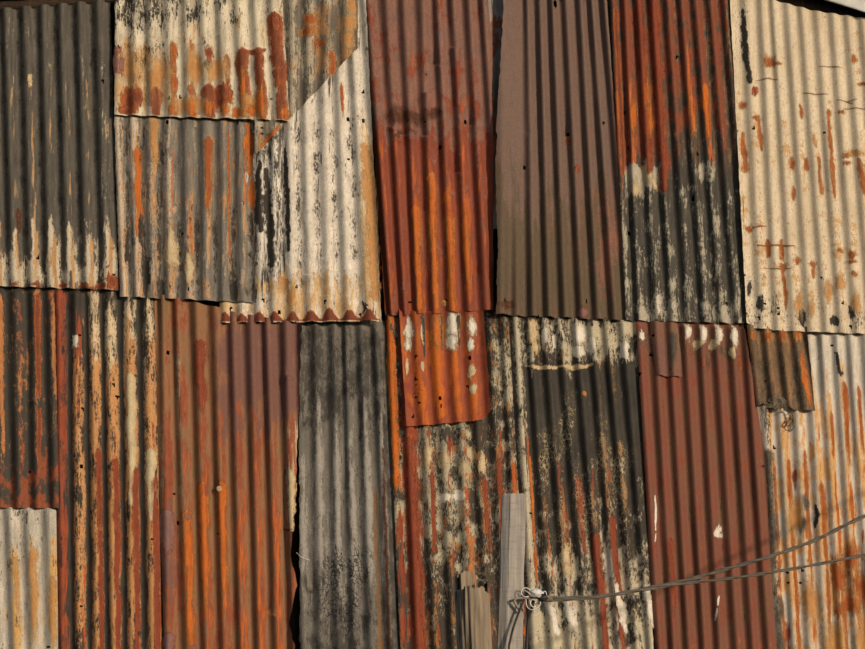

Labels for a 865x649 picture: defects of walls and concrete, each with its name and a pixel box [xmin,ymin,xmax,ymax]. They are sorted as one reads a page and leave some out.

rust [116,11,291,213]
rust [613,0,671,192]
rust [31,281,43,459]
peeling [254,141,318,268]
rust [410,171,471,351]
peeling [526,318,596,371]
peeling [686,323,738,359]
rust [151,478,229,649]
peeling [543,592,579,637]
peeling [602,541,629,633]
peeling [642,584,654,628]
rust [785,450,865,649]